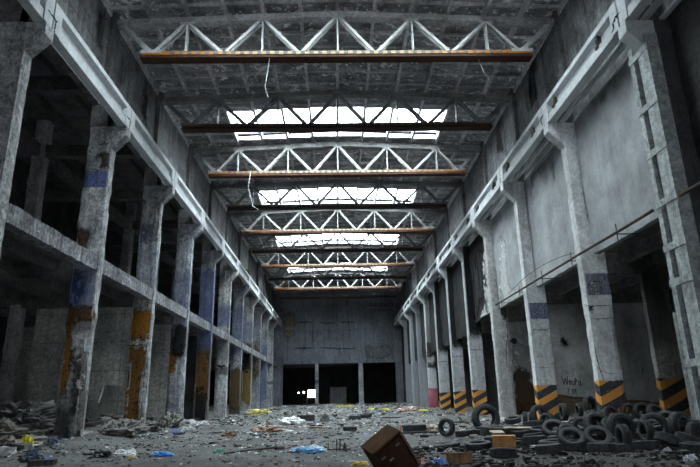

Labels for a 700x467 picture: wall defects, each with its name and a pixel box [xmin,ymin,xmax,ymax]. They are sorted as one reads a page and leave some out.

spalling [69,347,89,436]
spalling [511,341,536,414]